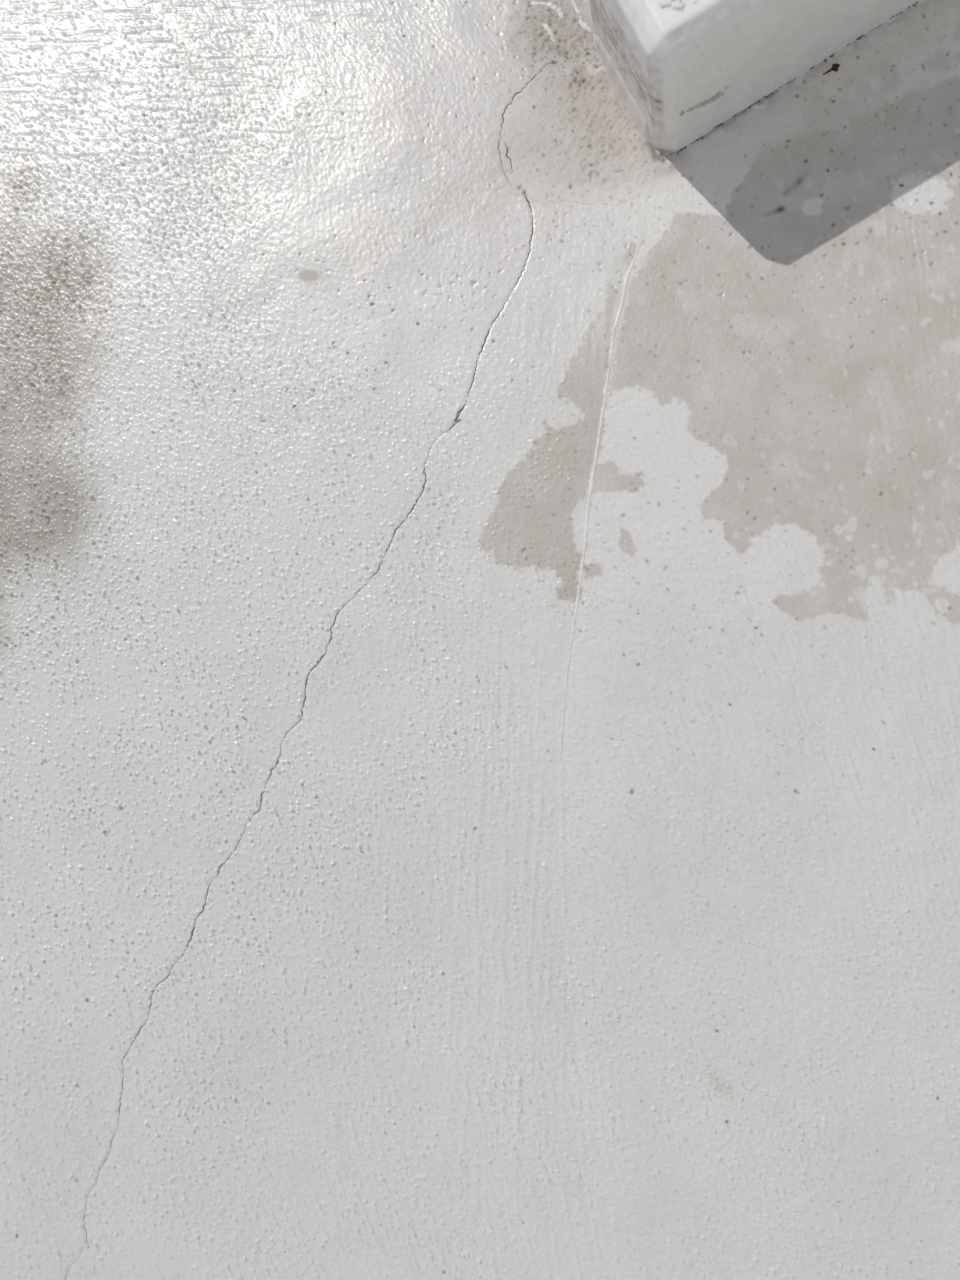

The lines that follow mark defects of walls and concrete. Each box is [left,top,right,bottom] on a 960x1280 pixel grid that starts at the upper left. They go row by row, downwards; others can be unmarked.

crack [65,63,553,1280]
damp [475,2,960,627]